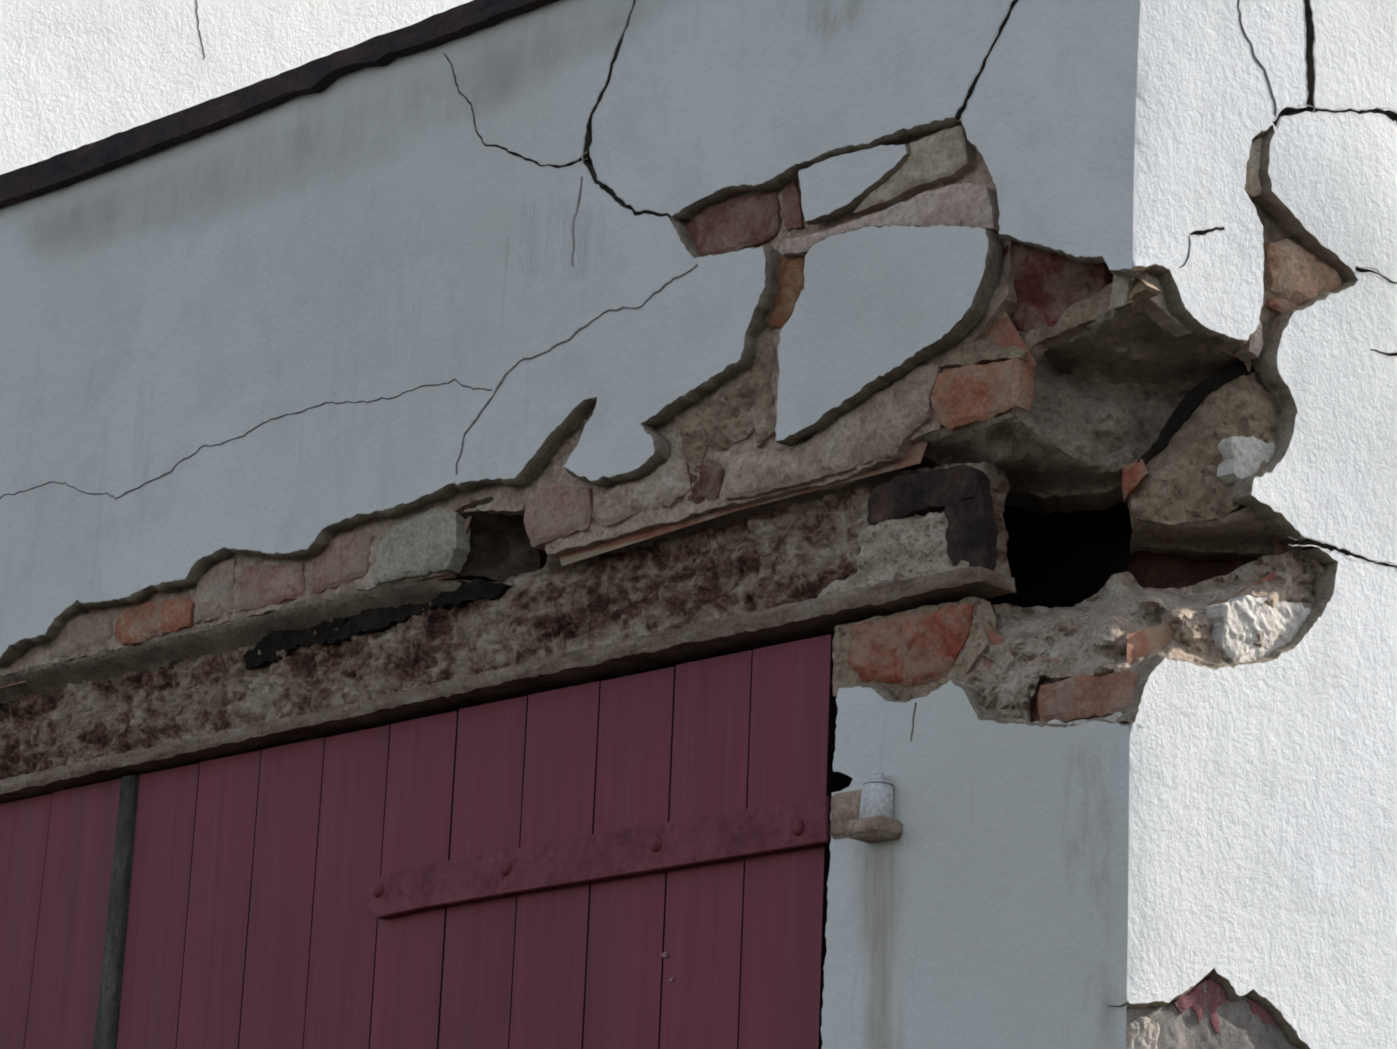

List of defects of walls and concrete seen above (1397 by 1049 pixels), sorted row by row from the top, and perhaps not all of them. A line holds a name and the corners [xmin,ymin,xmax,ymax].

crack [953,0,1020,121]
crack [1237,0,1397,129]
crack [444,0,671,267]
crack [1179,226,1225,268]
crack [1355,266,1397,284]
crack [0,264,698,500]
spalling [0,121,1344,725]
crack [1370,349,1397,357]
crack [1277,537,1397,568]
spalling [1126,978,1300,1049]